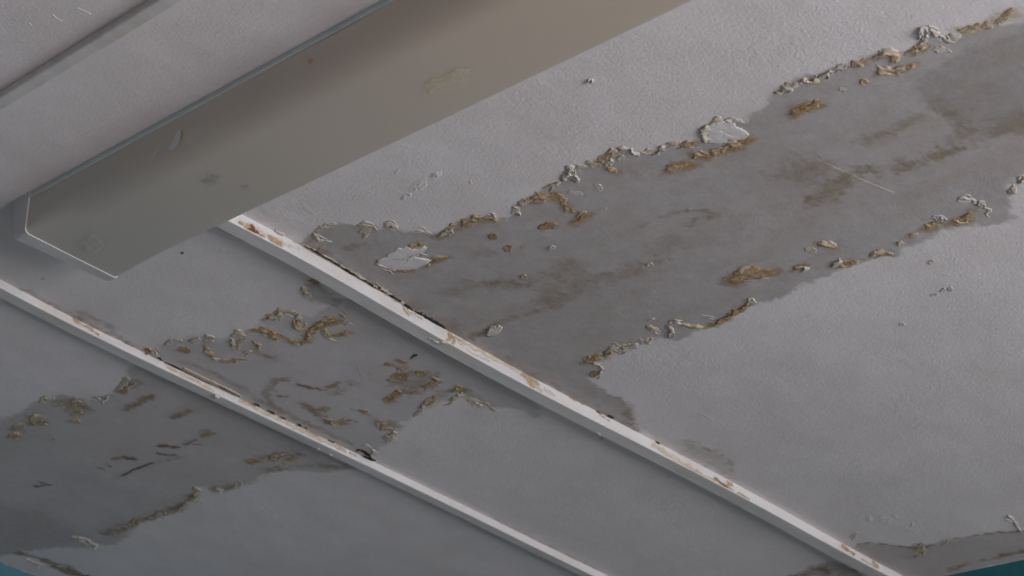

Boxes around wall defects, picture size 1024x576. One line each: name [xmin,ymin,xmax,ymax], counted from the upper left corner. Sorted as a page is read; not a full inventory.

peeling [773,7,1016,95]
peeling [790,99,827,119]
peeling [512,116,756,225]
peeling [1006,175,1024,195]
peeling [375,213,527,274]
peeling [538,222,557,230]
peeling [793,194,992,273]
peeling [723,265,780,286]
peeling [144,306,354,364]
peeling [580,297,756,379]
peeling [382,359,500,417]
peeling [321,409,398,461]